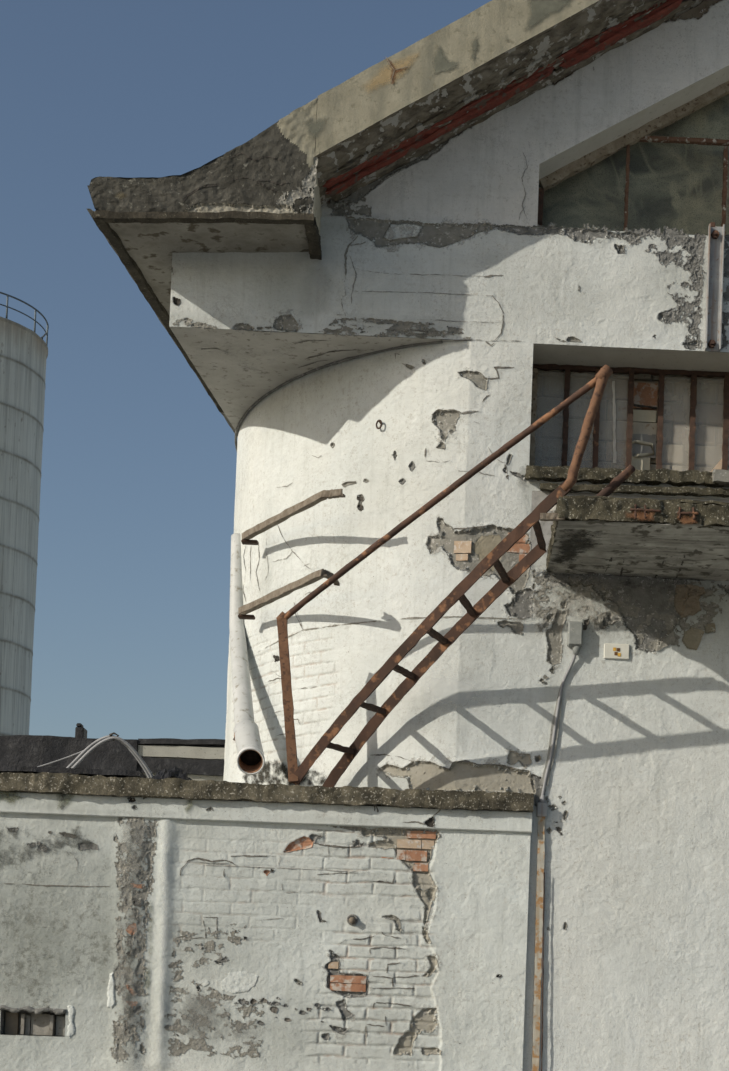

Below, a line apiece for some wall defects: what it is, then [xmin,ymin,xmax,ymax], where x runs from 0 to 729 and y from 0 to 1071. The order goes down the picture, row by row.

spalling [666,0,722,22]
peeling [172,318,217,330]
crack [341,236,514,346]
peeling [721,235,729,349]
spalling [398,366,514,485]
spalling [426,517,729,684]
mould [23,827,99,860]
spalling [374,750,568,835]
spalling [264,825,441,982]
peeling [164,915,407,1059]
spalling [393,1008,441,1056]